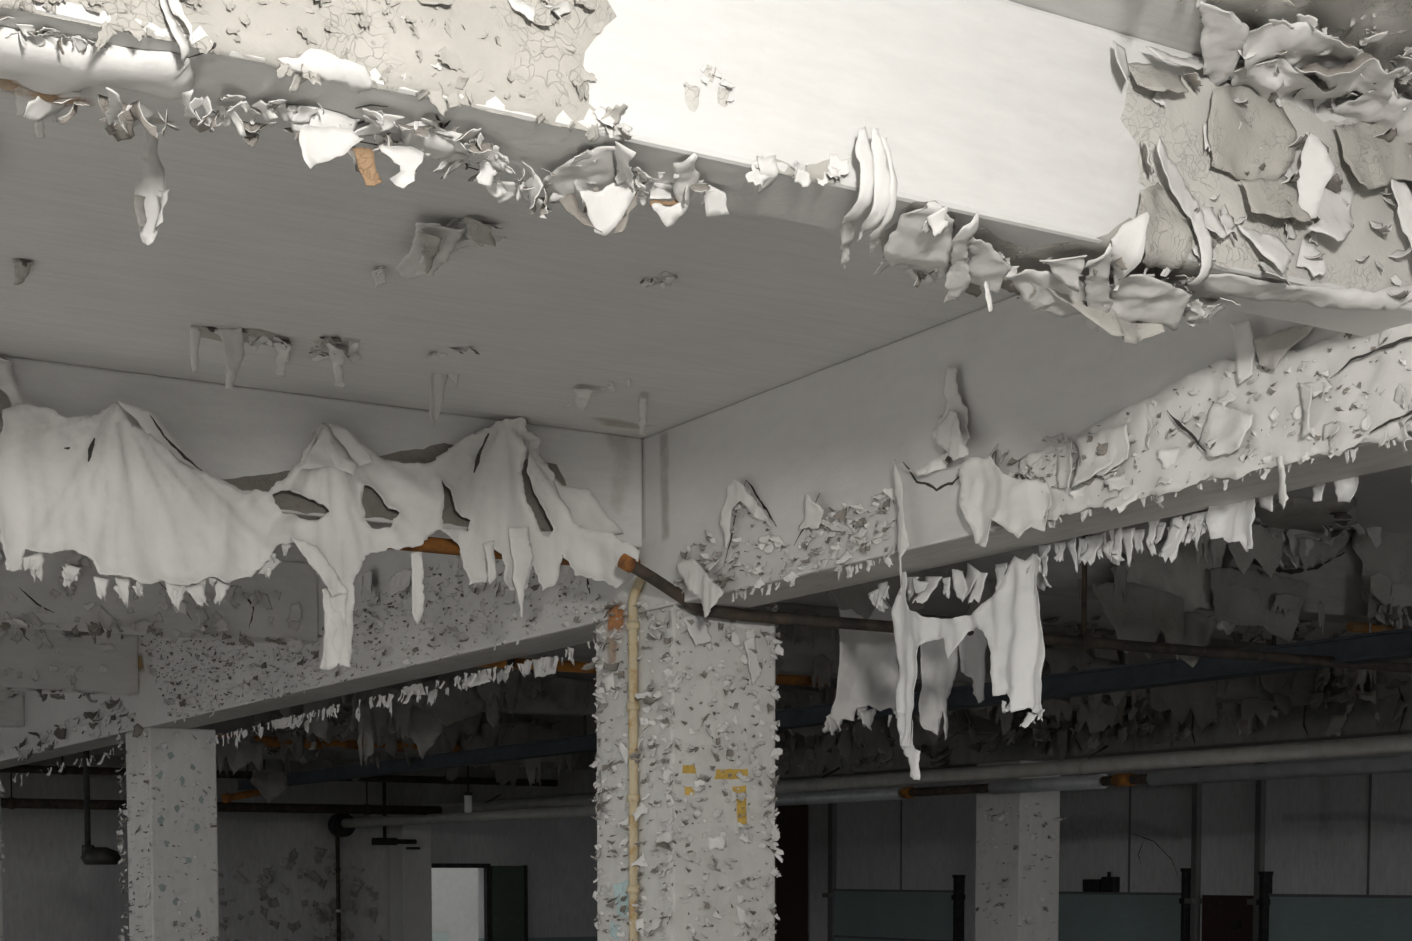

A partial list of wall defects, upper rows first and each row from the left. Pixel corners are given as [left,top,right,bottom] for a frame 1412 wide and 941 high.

peeling [0,0,735,246]
peeling [12,258,34,285]
peeling [395,216,506,280]
peeling [0,320,1412,941]